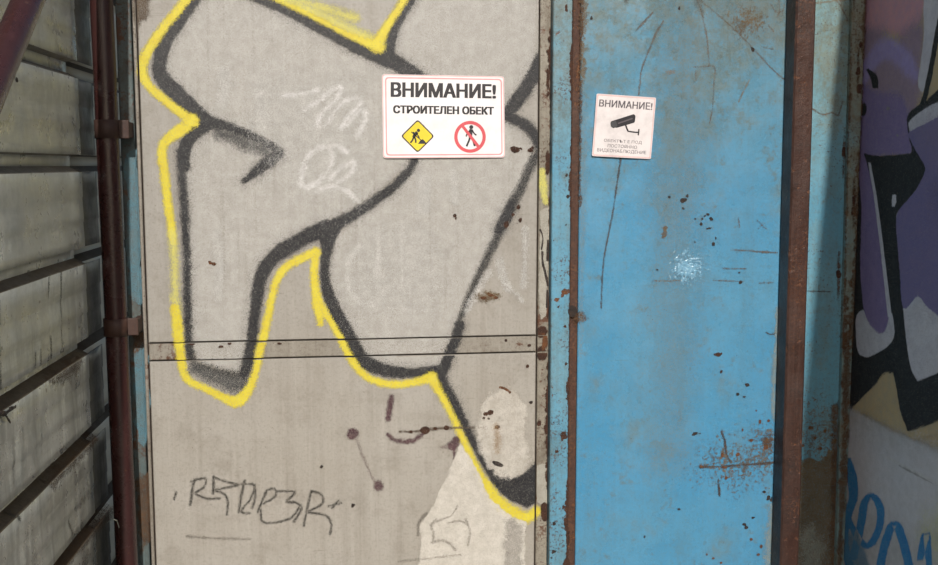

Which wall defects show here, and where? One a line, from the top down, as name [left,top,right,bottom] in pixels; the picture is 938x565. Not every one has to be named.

corrosion [568,0,589,225]
corrosion [801,0,867,565]
peeling [416,385,547,565]
corrosion [528,314,548,488]
corrosion [563,303,571,565]
corrosion [685,410,776,500]